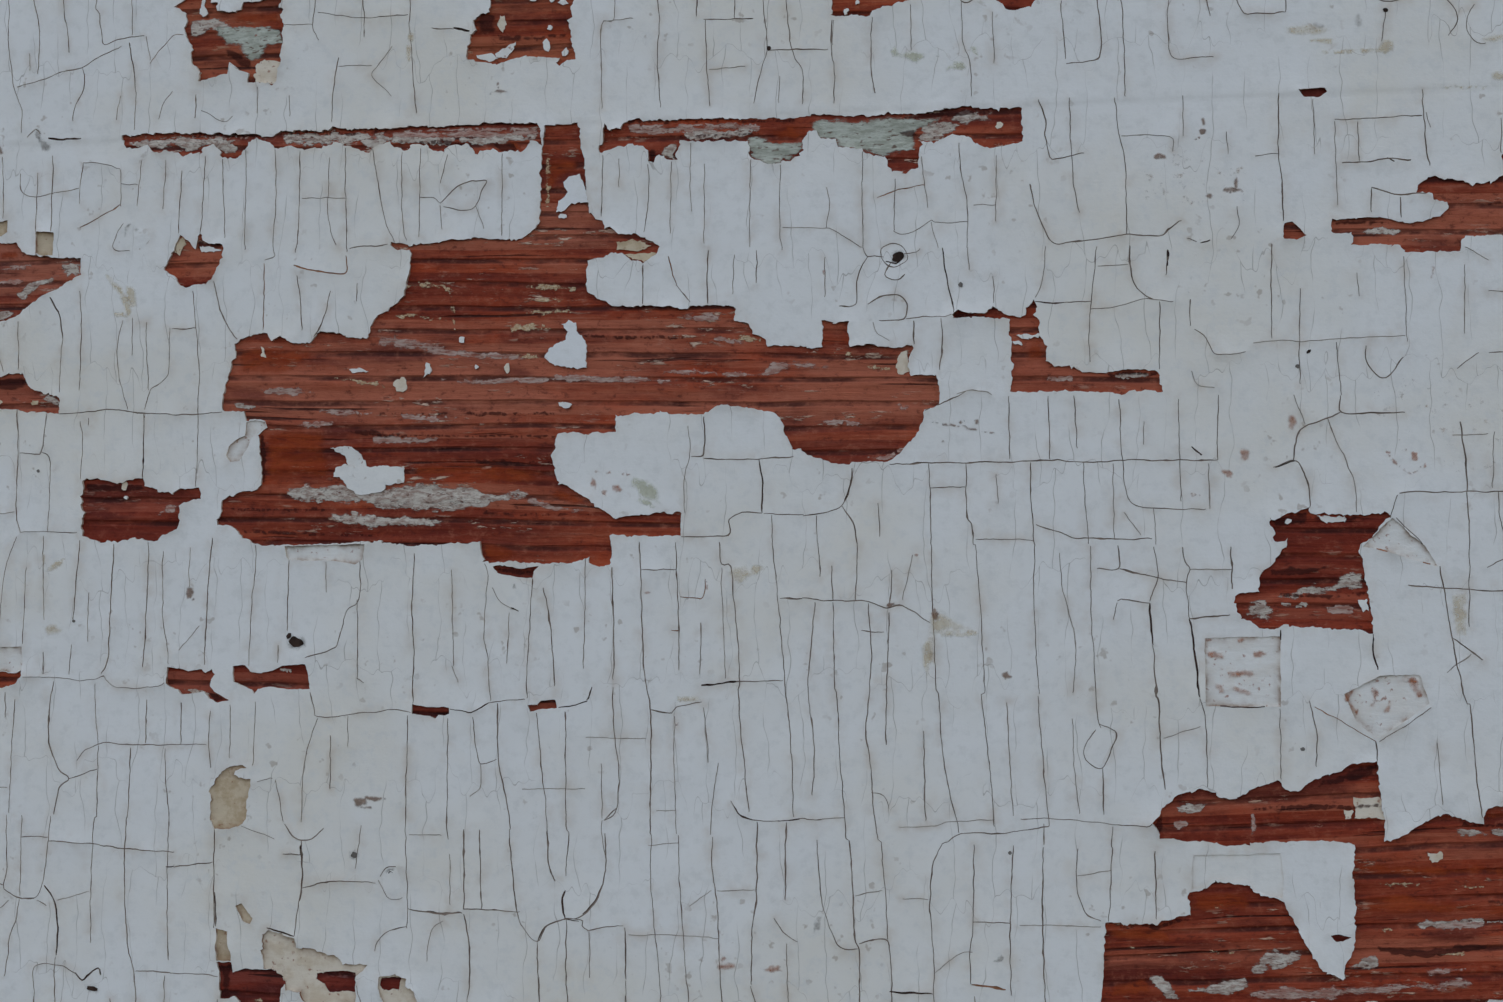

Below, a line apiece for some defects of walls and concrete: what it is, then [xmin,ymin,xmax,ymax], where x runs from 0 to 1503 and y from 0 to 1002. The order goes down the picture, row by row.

crack [3,0,503,336]
peeling [467,0,576,66]
peeling [123,106,1023,578]
crack [601,152,997,370]
crack [1030,0,1408,512]
crack [1312,89,1431,217]
peeling [1331,155,1503,253]
peeling [82,478,201,543]
crack [0,283,1282,1002]
peeling [1204,508,1437,707]
crack [1377,422,1503,818]
peeling [1101,761,1503,1002]